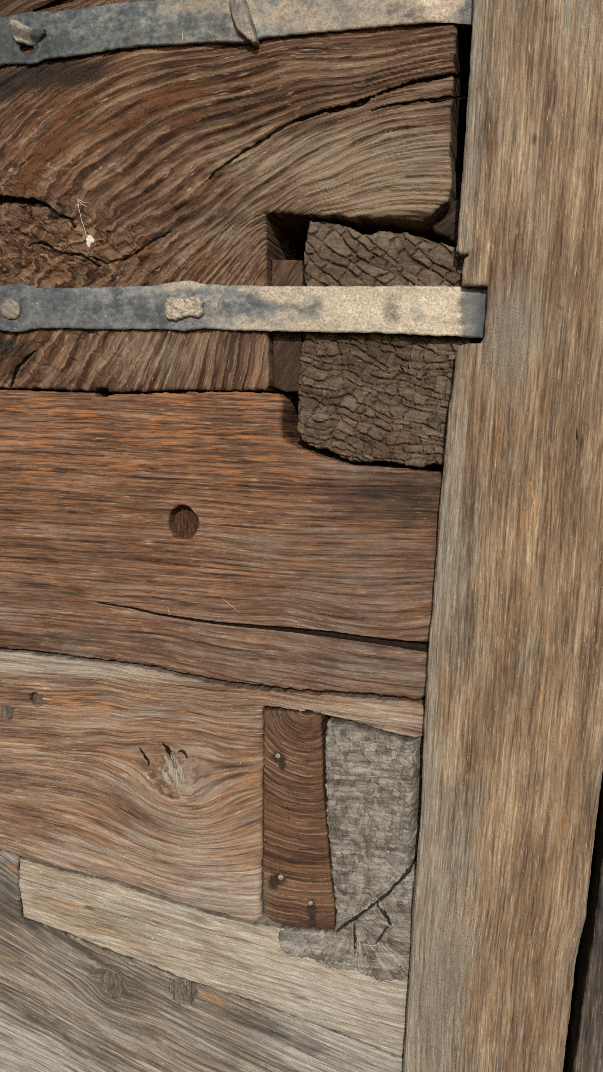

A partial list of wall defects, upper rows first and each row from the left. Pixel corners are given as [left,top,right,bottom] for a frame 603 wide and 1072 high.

crack [33,0,74,12]
crack [209,72,465,179]
crack [0,196,172,267]
crack [97,602,429,652]